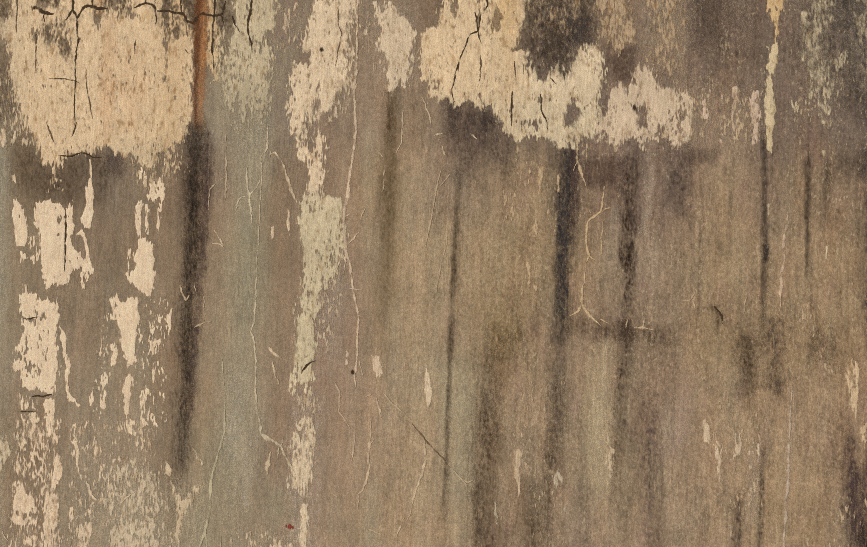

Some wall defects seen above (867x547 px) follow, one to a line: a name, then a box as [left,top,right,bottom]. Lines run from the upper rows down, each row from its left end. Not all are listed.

crack [15,0,108,158]
crack [134,0,253,67]
rust [193,0,207,118]
crack [451,0,488,102]
peeling [0,0,199,547]
leakage [179,125,209,378]
crack [335,0,473,535]
peeling [205,0,784,547]
peeling [806,497,867,547]
leakage [846,447,867,547]